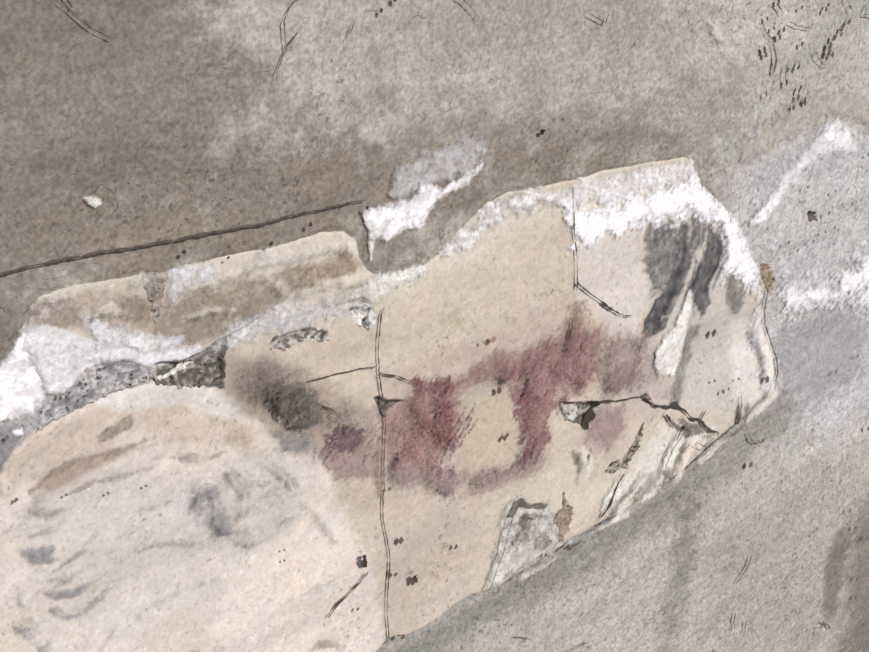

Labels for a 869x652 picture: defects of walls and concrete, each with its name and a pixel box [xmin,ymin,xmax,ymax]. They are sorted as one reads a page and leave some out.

damp [170,263,218,301]
damp [214,265,429,350]
damp [364,131,486,260]
crack [572,187,631,316]
damp [440,91,869,392]
damp [0,315,203,435]
flaking render [37,320,251,430]
crack [306,308,414,637]
crack [488,505,520,594]
flaking render [488,491,574,588]
crack [599,474,625,520]
crack [582,395,742,501]